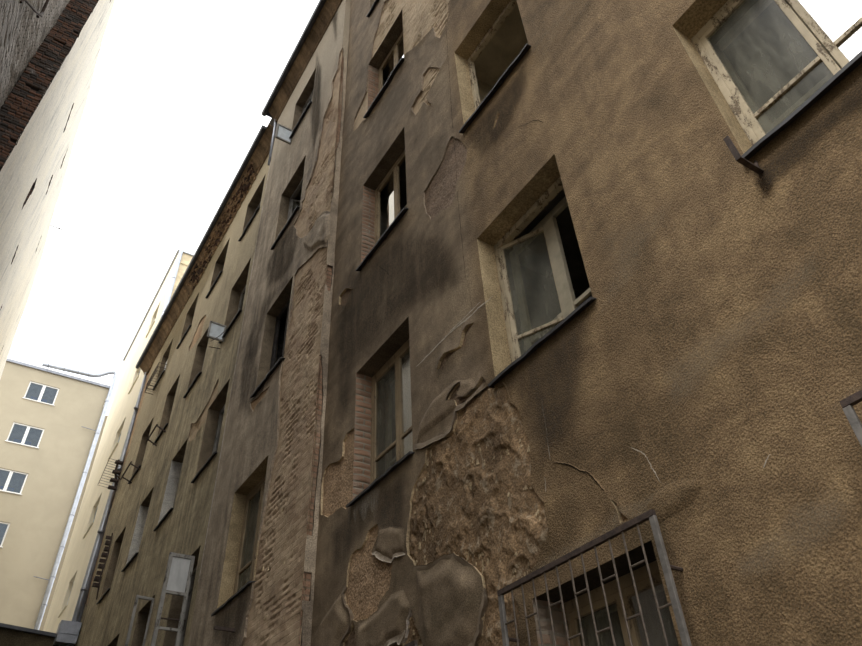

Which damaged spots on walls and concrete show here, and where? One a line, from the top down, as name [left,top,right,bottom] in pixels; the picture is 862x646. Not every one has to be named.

spalling [294,48,344,238]
spalling [352,0,450,133]
spalling [241,247,548,646]